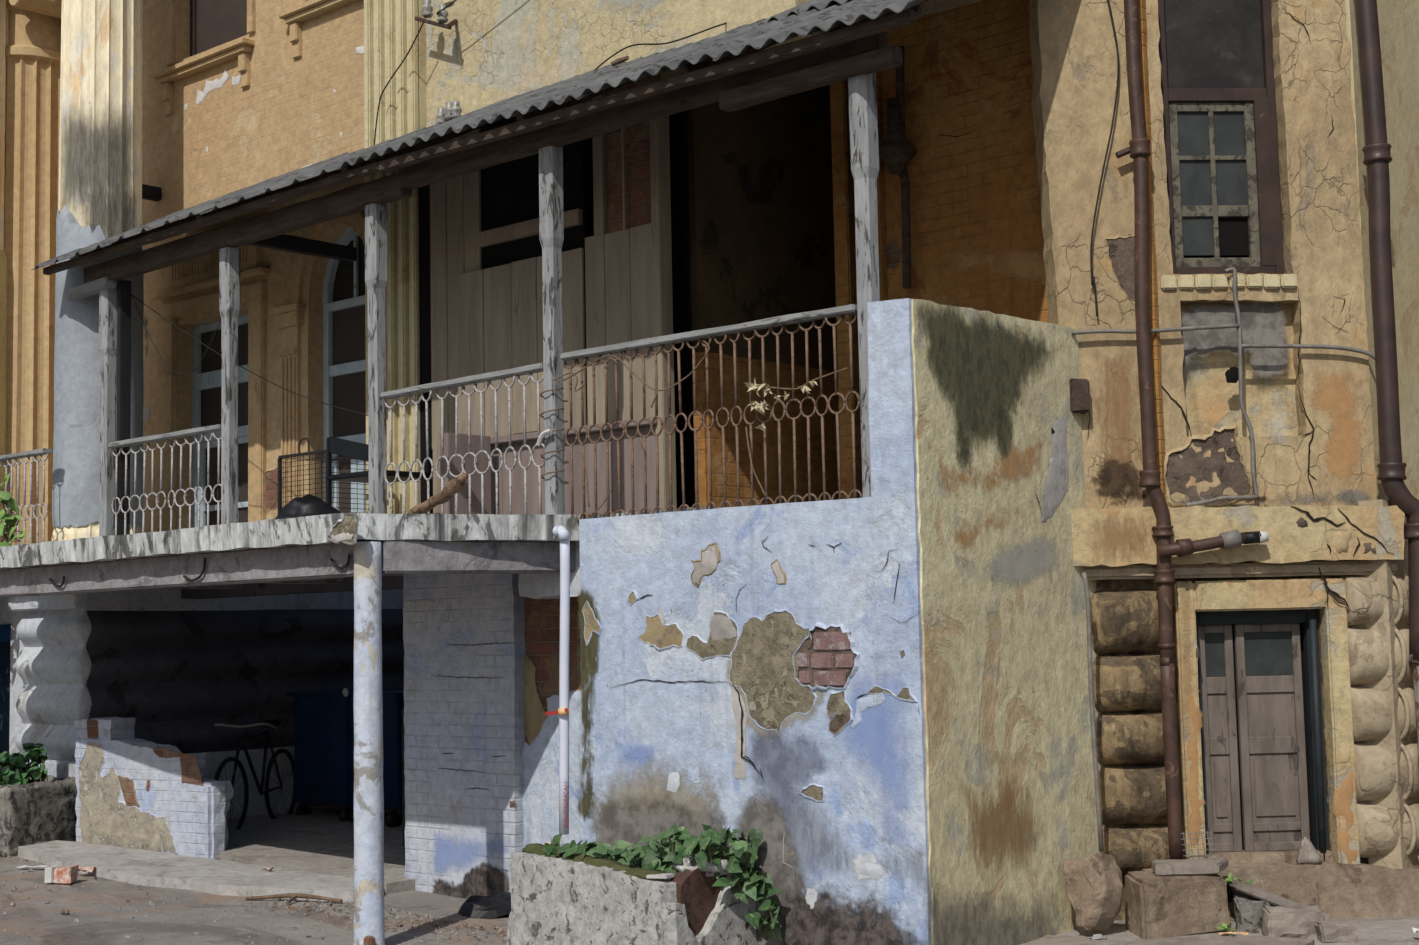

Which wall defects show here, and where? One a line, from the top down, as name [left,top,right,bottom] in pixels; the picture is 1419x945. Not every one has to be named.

peeling [184,69,241,110]
leakage [919,304,1048,491]
spalling [1225,366,1238,383]
spalling [1164,425,1254,508]
crack [1291,288,1394,611]
spalling [691,543,721,589]
spalling [582,601,603,647]
spalling [627,589,918,737]
spalling [77,719,179,854]
spalling [153,746,204,786]
crack [606,679,763,779]
leakage [577,590,1053,945]